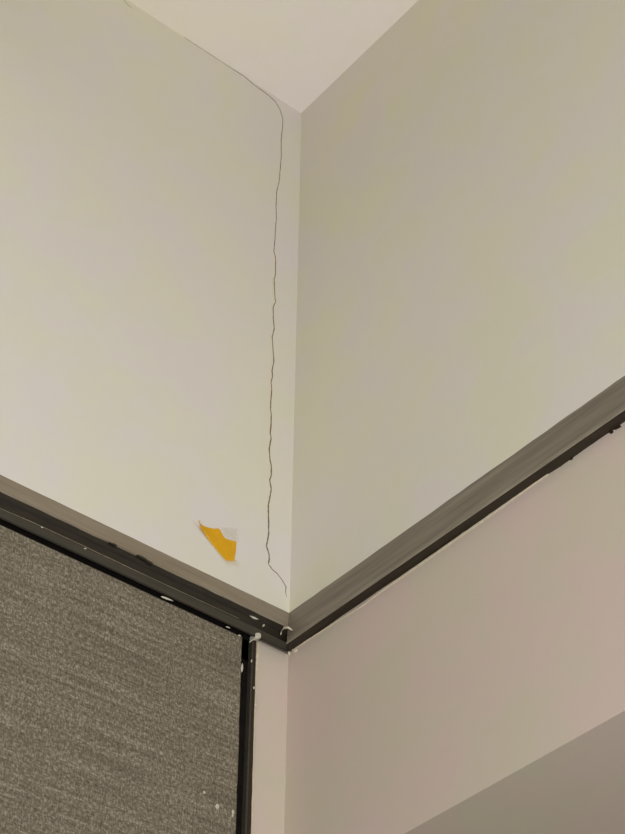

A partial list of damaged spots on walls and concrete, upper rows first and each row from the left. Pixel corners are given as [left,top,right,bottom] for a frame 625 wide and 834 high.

crack [184,37,287,596]